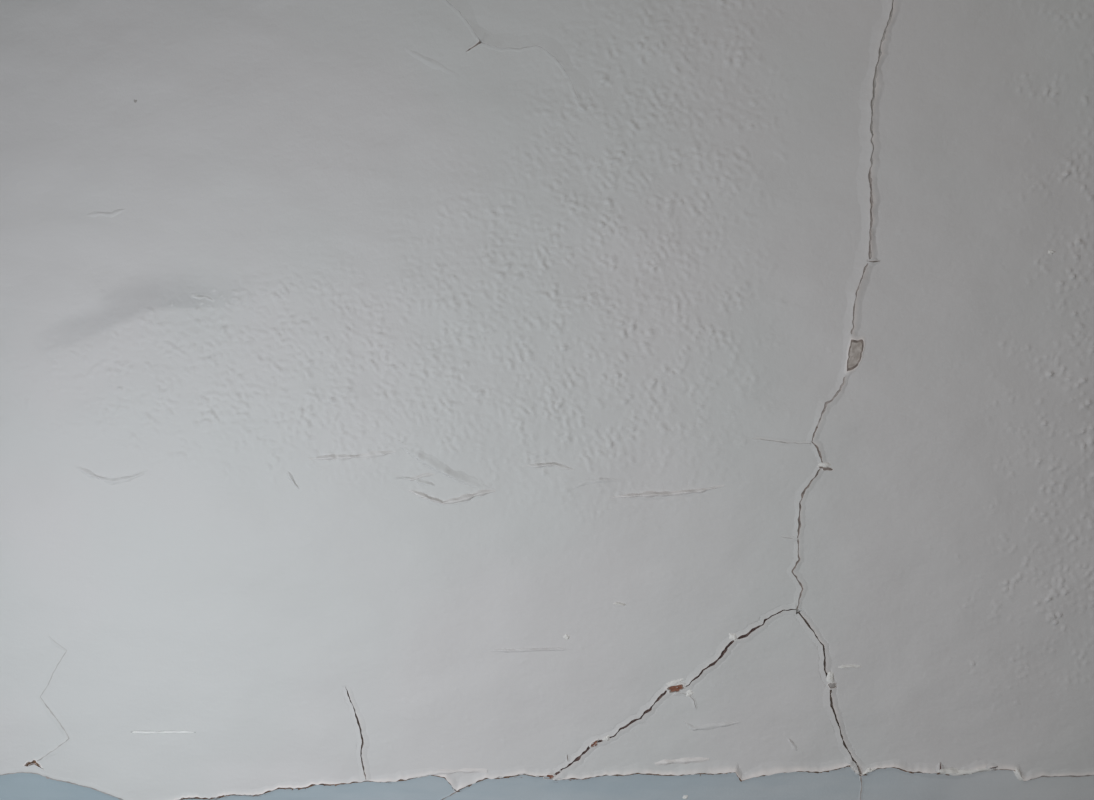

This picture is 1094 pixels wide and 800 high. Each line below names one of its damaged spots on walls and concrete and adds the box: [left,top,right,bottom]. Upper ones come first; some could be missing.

crack [431,0,1094,800]
flaking render [664,682,686,694]
crack [148,685,441,800]
peeling [0,758,120,800]
peeling [183,767,1094,800]